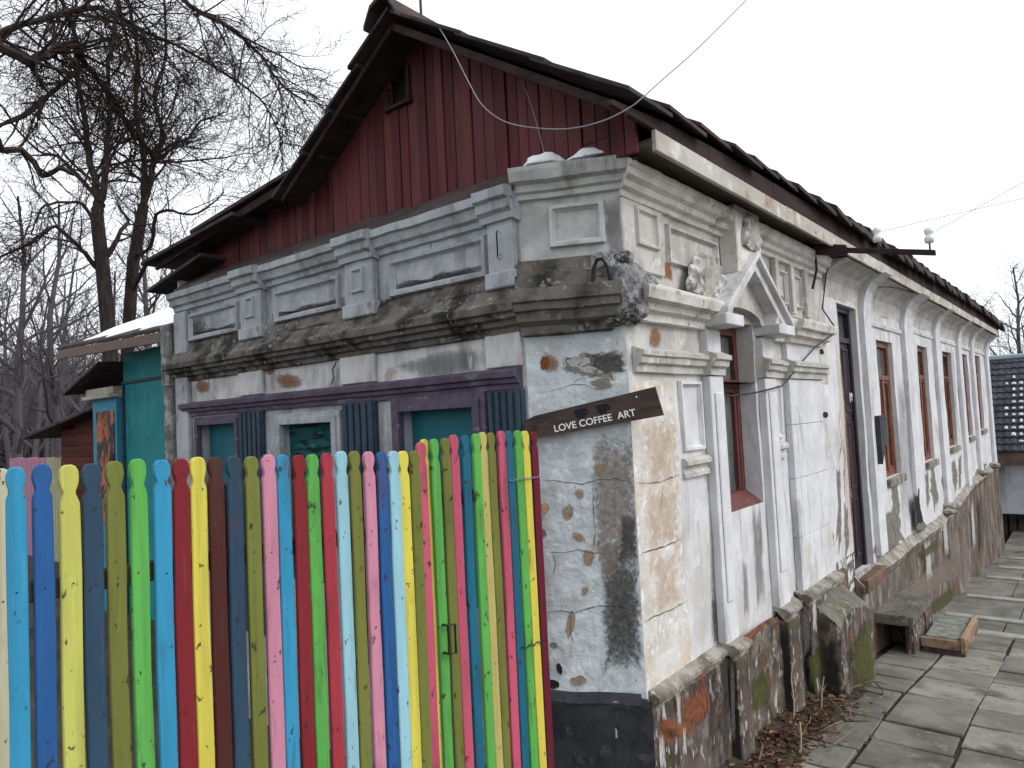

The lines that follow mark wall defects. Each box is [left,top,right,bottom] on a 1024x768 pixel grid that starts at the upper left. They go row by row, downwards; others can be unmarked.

peeling [562,349,628,390]
crack [546,475,680,573]
water stain [593,438,641,667]